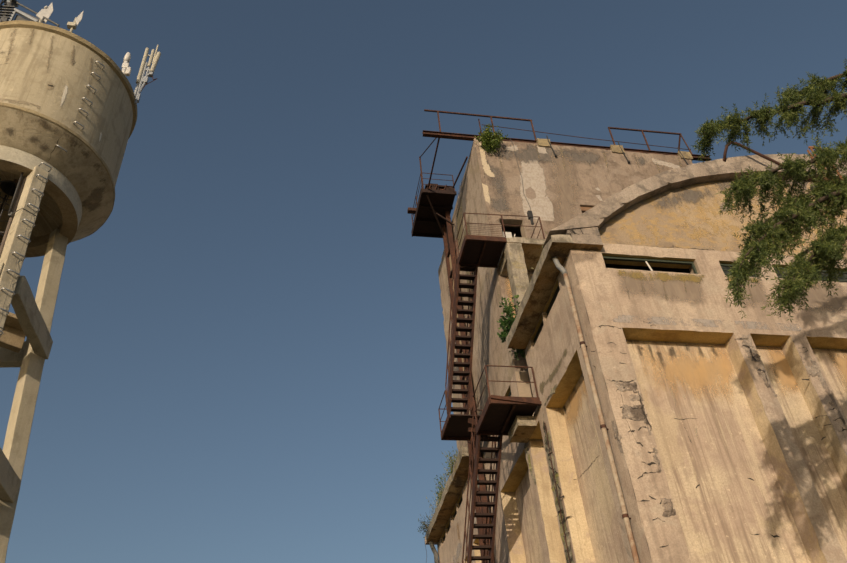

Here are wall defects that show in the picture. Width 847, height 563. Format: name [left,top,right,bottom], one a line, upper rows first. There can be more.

flaking render [520,146,555,221]
water stain [658,189,708,208]
spalling [737,334,777,397]
spalling [611,381,652,453]
spalling [660,498,676,517]